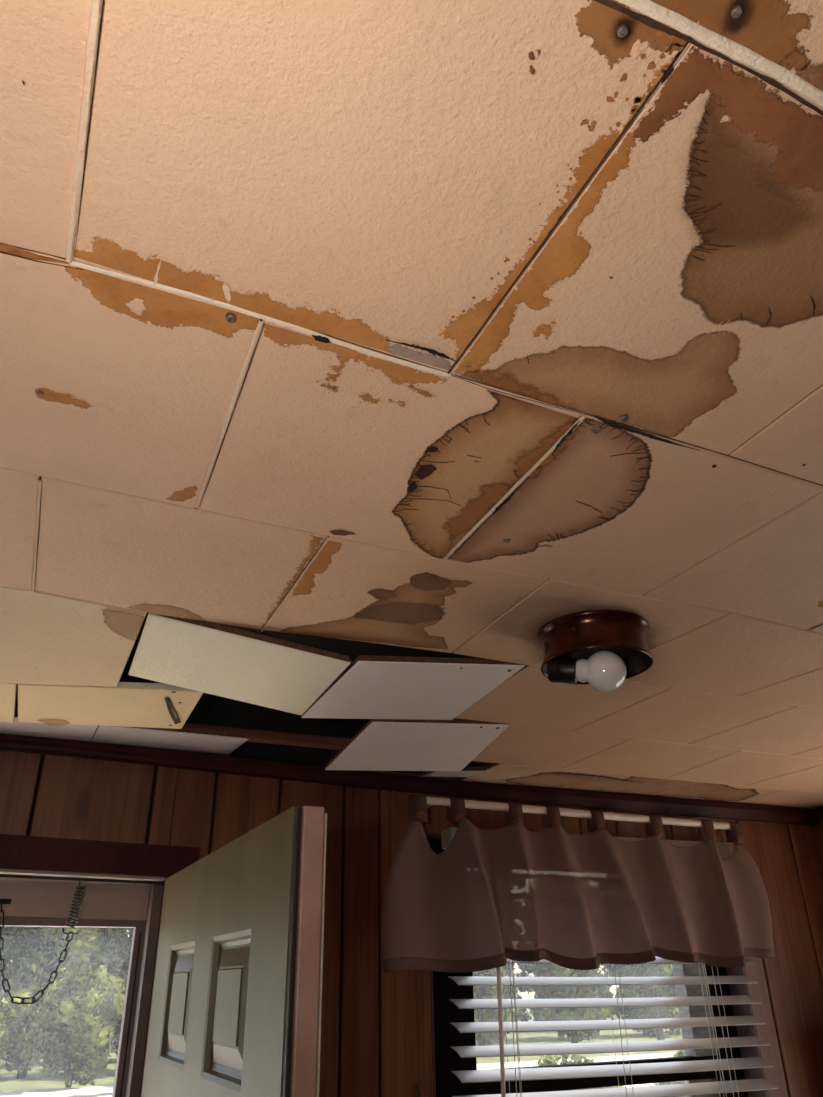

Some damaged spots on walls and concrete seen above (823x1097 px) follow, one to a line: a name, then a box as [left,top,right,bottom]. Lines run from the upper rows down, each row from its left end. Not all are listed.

water stain [797,63,823,91]
peeling [65,0,823,399]
water stain [392,94,823,563]
peeling [35,388,93,409]
peeling [359,392,408,407]
peeling [262,529,355,628]
water stain [280,573,473,649]